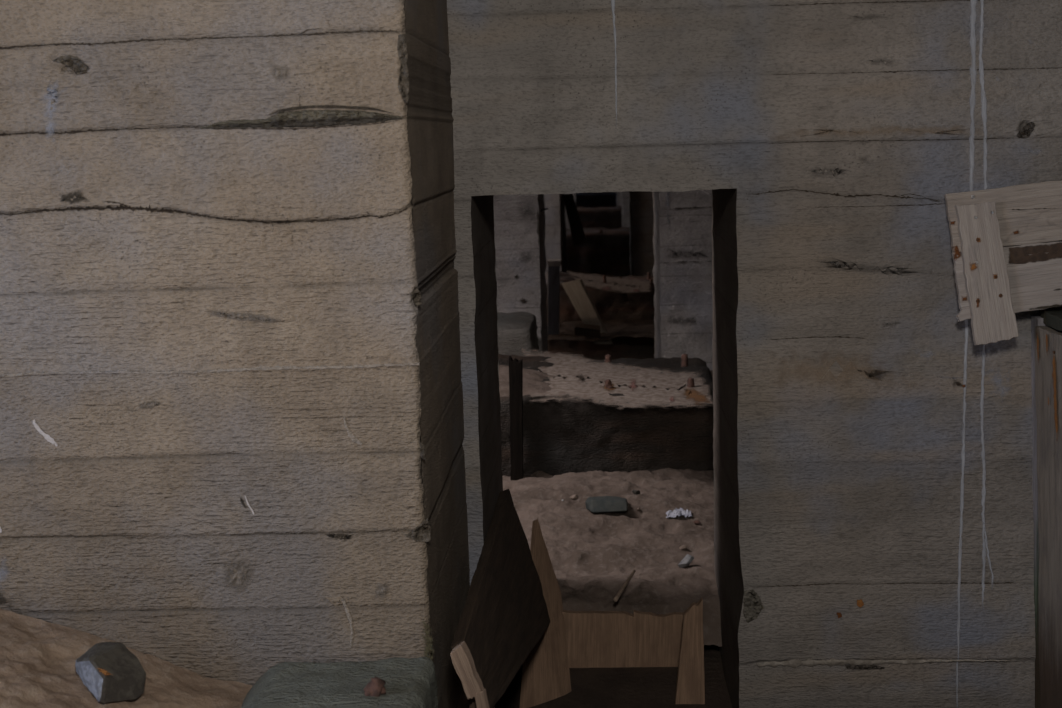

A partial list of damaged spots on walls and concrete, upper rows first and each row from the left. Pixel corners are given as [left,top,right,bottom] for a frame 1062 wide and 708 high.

spalling [201,97,403,130]
spalling [397,34,409,105]
damp [880,0,988,191]
crack [1,201,408,232]
damp [956,319,968,707]
damp [980,345,1003,602]